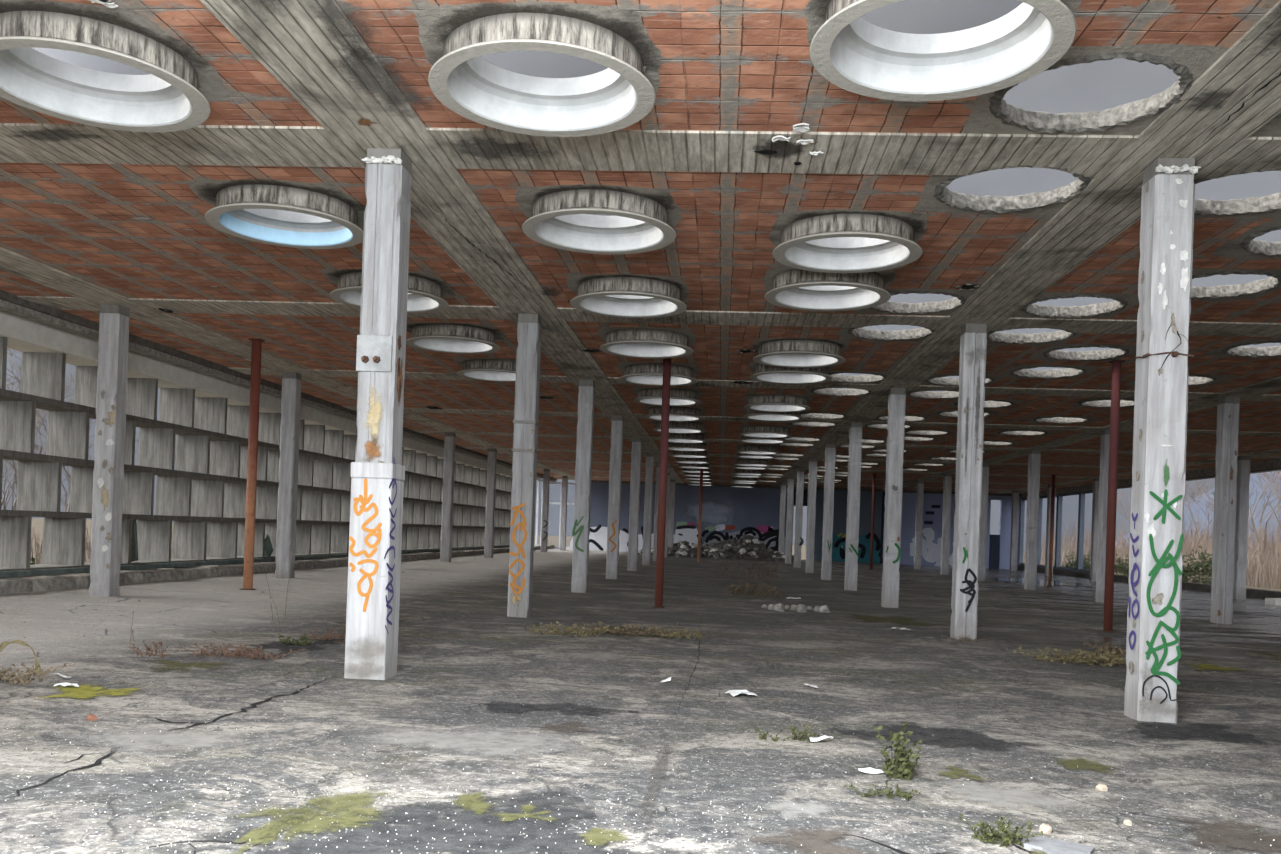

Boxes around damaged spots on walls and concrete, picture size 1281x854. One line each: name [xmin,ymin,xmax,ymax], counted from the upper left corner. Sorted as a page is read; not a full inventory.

leakage [320,0,423,108]
crack [156,676,335,732]
crack [0,746,123,799]